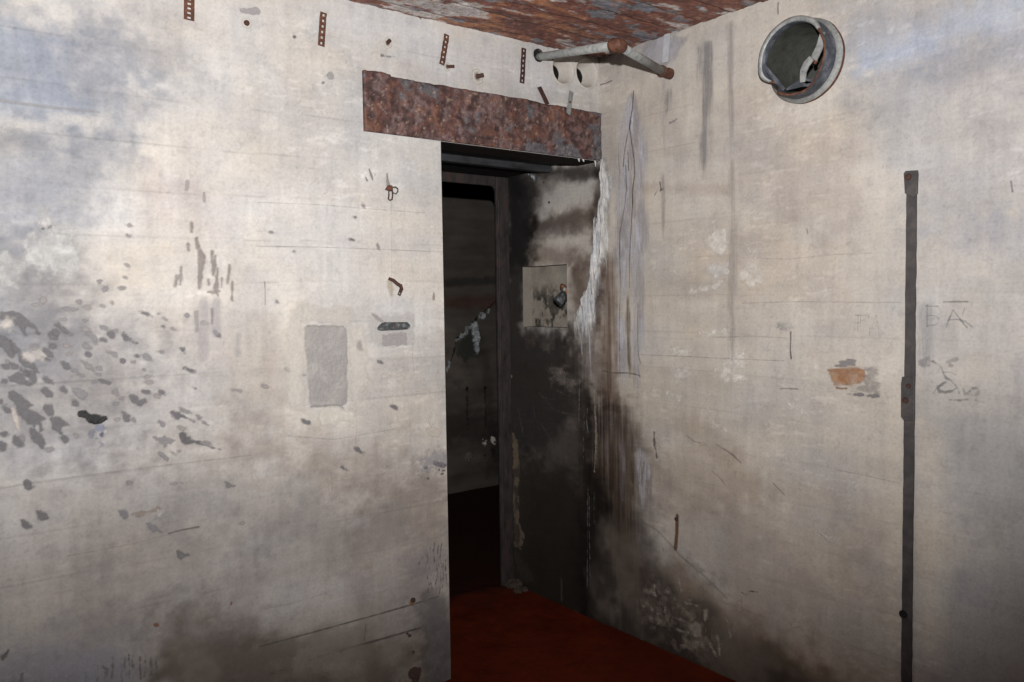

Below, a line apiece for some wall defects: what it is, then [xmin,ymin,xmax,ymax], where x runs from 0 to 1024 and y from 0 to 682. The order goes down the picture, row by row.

peeling [24,217,79,272]
damp [574,96,647,381]
peeling [23,352,47,361]
damp [587,497,804,682]